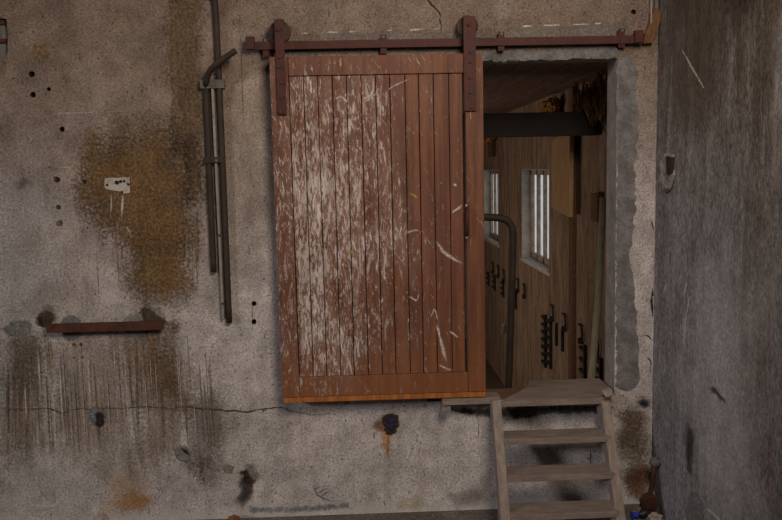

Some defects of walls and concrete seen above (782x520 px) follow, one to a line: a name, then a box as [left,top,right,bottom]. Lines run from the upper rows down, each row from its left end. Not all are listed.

crack [425,0,442,35]
rust [78,115,207,305]
crack [0,406,331,416]
rust [374,414,399,452]